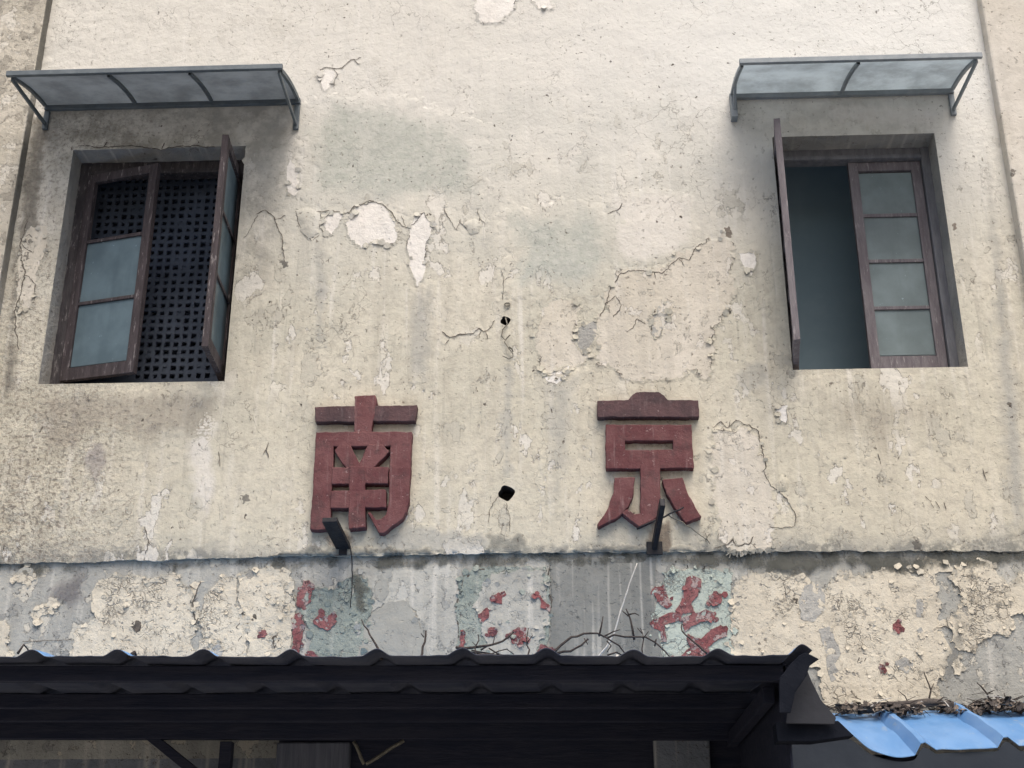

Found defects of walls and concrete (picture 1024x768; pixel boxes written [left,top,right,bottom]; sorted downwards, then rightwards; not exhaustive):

peeling [472,0,556,26]
peeling [316,68,337,93]
leakage [242,86,495,234]
crack [13,221,41,349]
crack [242,200,489,262]
peeling [318,201,437,288]
crack [442,271,509,345]
crack [596,248,696,332]
crack [710,415,802,549]
peeling [69,425,1024,709]